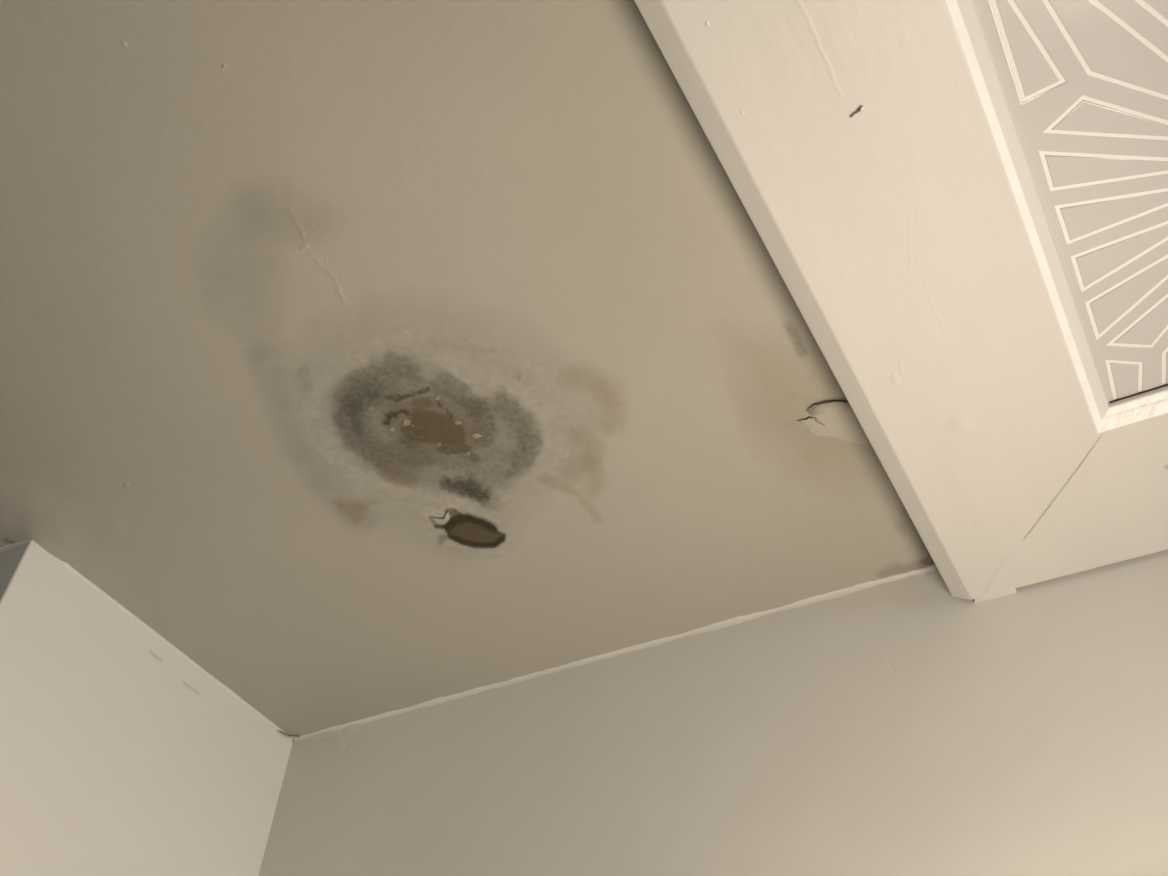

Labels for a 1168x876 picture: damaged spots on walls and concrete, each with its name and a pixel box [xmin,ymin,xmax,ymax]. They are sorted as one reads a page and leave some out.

damp [306,367,528,505]
spalling [426,496,506,547]